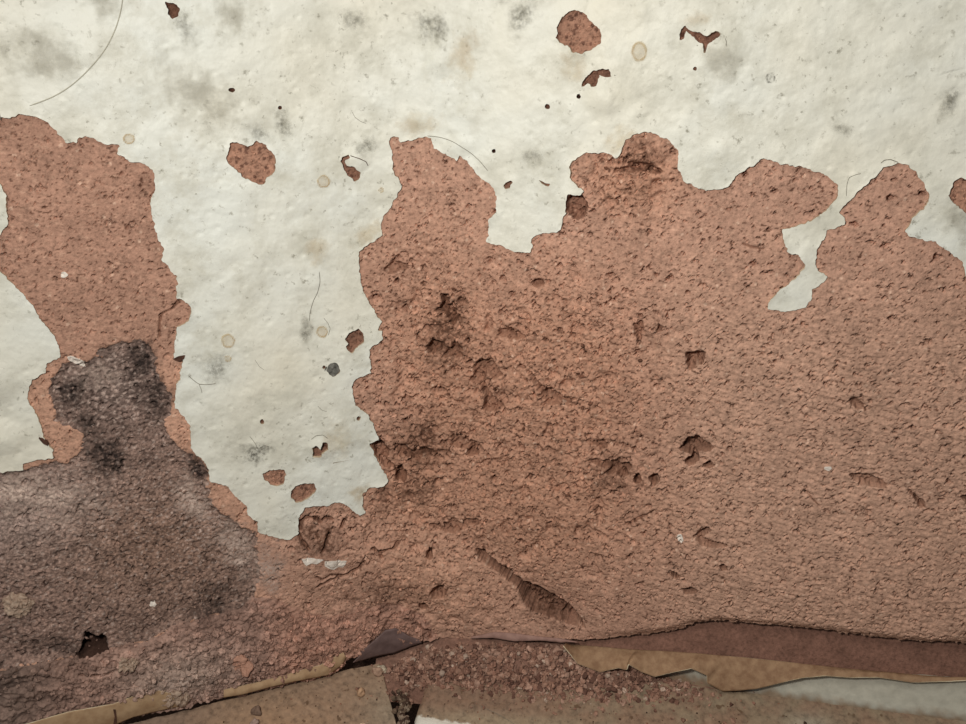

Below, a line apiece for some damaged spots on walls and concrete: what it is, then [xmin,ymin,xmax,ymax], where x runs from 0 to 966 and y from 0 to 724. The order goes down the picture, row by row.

peeling [552,5,605,57]
peeling [577,65,615,90]
damp [130,344,151,374]
damp [60,381,83,402]
spalling [0,109,438,724]
peeling [266,128,966,677]
damp [88,442,124,473]
damp [0,472,98,522]
damp [177,455,209,517]
damp [220,524,280,591]